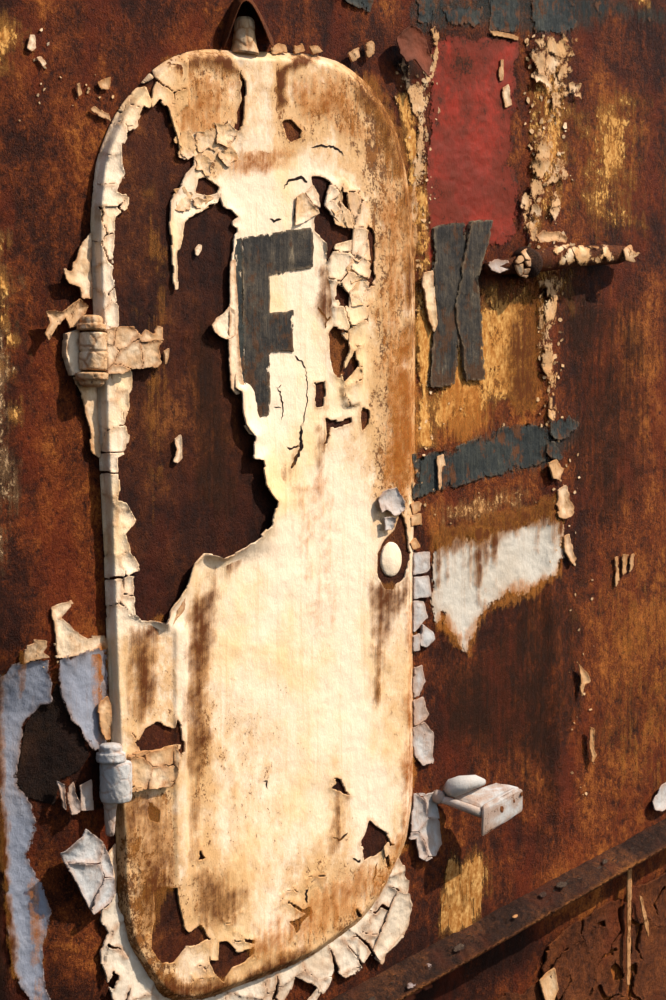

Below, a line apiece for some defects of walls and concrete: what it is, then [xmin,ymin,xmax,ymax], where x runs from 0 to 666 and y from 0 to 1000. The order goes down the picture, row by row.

corrosion [167,52,237,130]
peeling [108,74,278,625]
crack [275,356,308,469]
peeling [295,176,375,307]
peeling [377,0,664,653]
corrosion [187,588,216,790]
corrosion [371,580,413,655]
corrosion [437,498,563,592]
peeling [0,600,112,1000]
peeling [60,829,171,1000]
corrosion [154,812,409,1000]
peeling [152,821,413,1000]